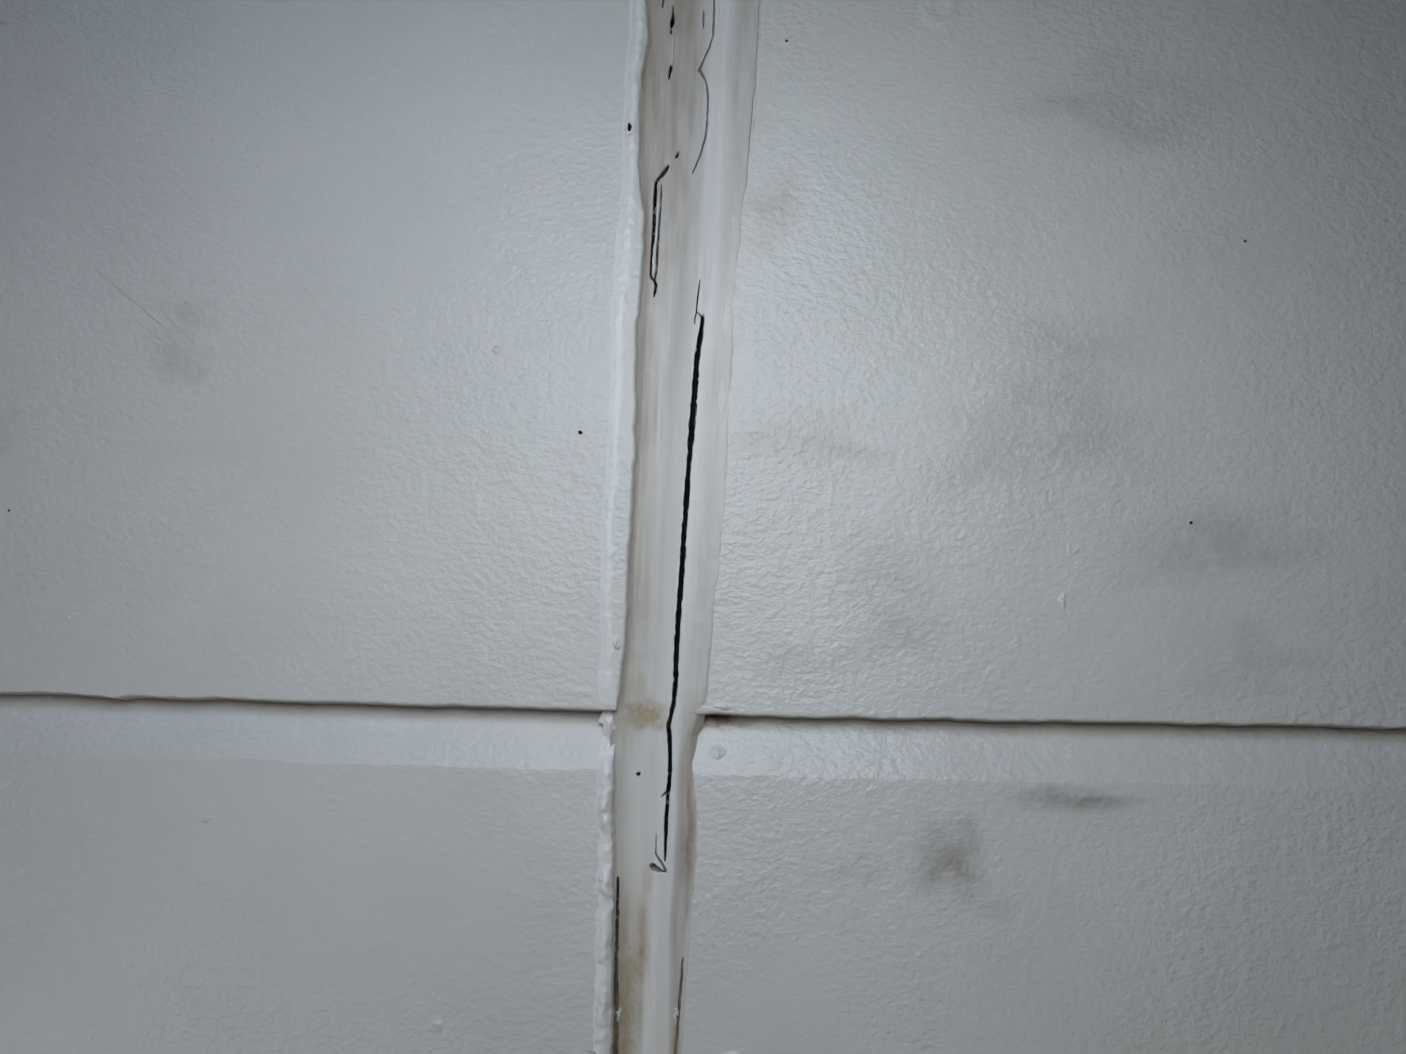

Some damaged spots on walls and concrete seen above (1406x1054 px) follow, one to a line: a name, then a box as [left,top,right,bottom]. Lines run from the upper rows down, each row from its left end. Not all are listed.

crack [650,0,715,297]
crack [664,281,704,861]